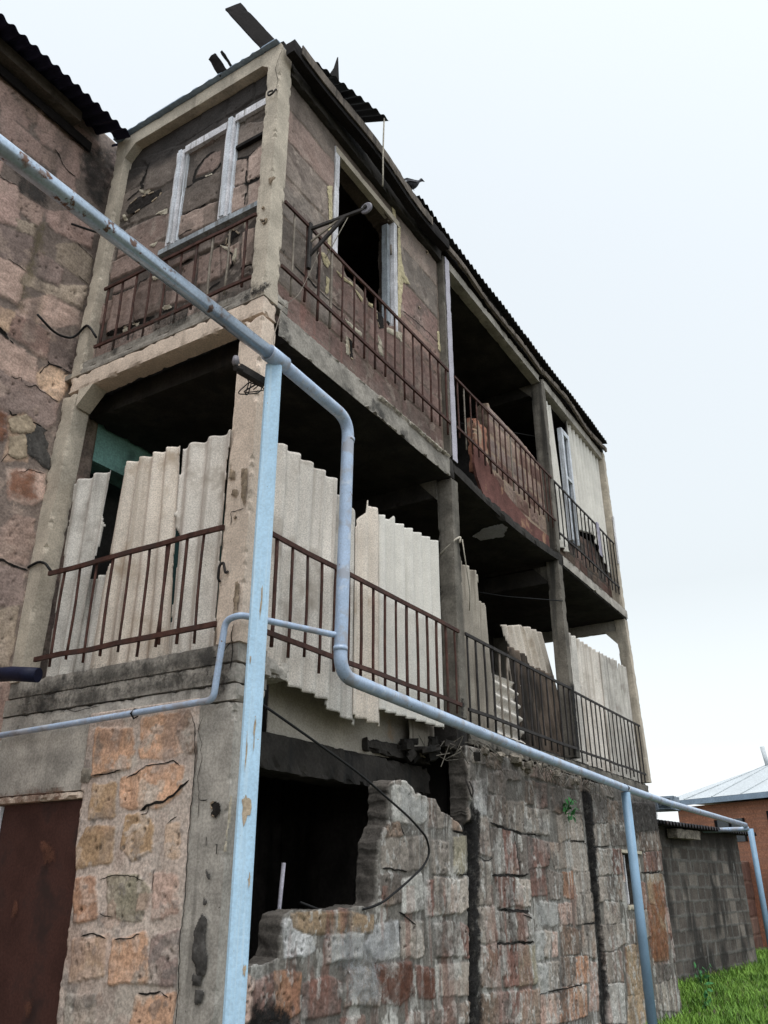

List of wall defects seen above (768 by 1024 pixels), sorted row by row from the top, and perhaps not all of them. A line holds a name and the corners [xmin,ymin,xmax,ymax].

spalling [122,189,168,221]
peeling [472,524,508,541]
damp [17,651,229,716]
peeling [210,795,252,854]
crack [92,715,208,1024]
spalling [191,897,207,1005]